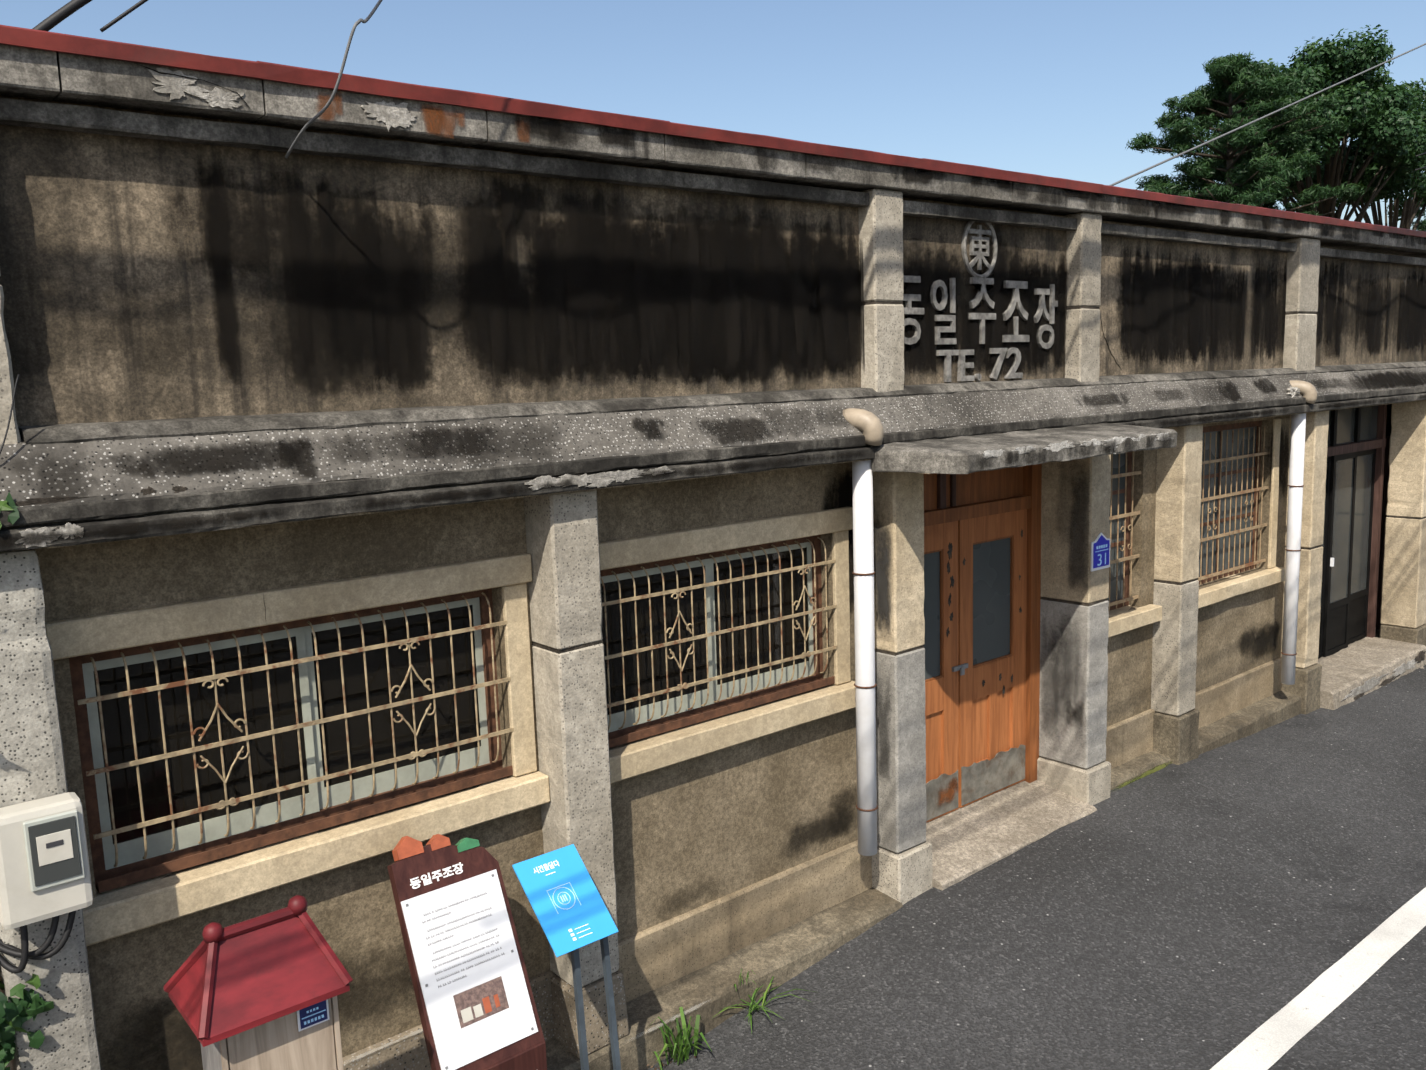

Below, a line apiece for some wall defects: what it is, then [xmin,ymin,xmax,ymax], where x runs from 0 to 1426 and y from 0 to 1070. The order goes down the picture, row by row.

damp [597,125,634,146]
damp [179,165,432,389]
damp [460,178,865,384]
damp [1118,252,1287,364]
damp [1317,263,1426,355]
damp [1320,371,1426,408]
damp [633,418,664,439]
damp [701,418,770,444]
damp [1071,383,1289,455]
damp [118,440,316,477]
damp [0,511,268,546]
damp [790,804,851,850]